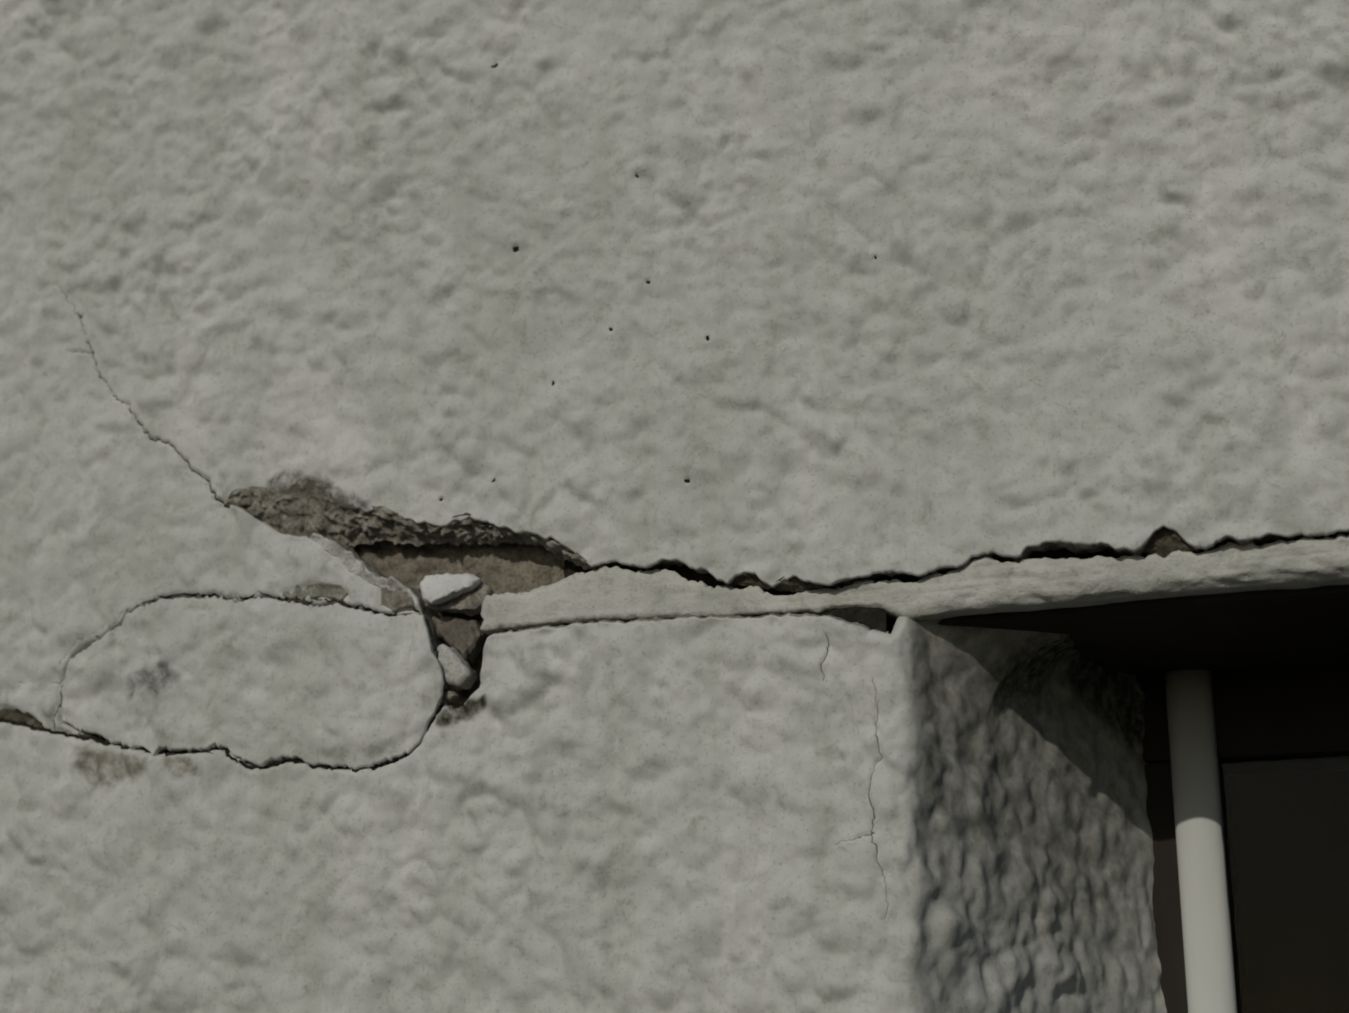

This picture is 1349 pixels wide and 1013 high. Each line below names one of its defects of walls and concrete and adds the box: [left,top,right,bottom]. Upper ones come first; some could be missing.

crack [57,283,229,508]
spalling [224,478,593,612]
crack [997,548,1165,563]
crack [0,591,419,772]
spalling [438,612,489,636]
spalling [462,652,483,703]
crack [491,559,947,681]